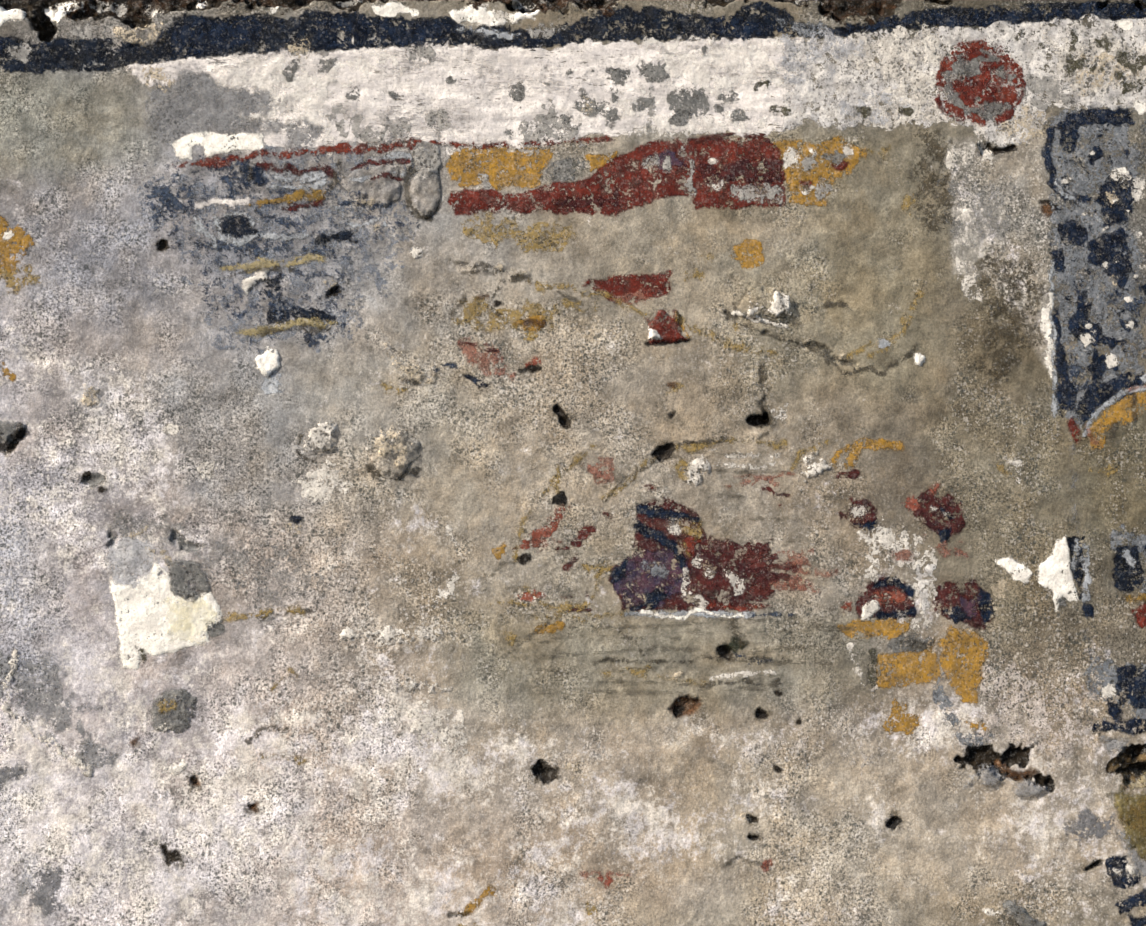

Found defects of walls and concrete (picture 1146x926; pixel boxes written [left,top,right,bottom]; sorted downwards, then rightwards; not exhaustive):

spalling [0,0,618,63]
spalling [705,0,749,8]
spalling [774,0,902,37]
spalling [954,743,1055,798]
spalling [1105,744,1146,790]